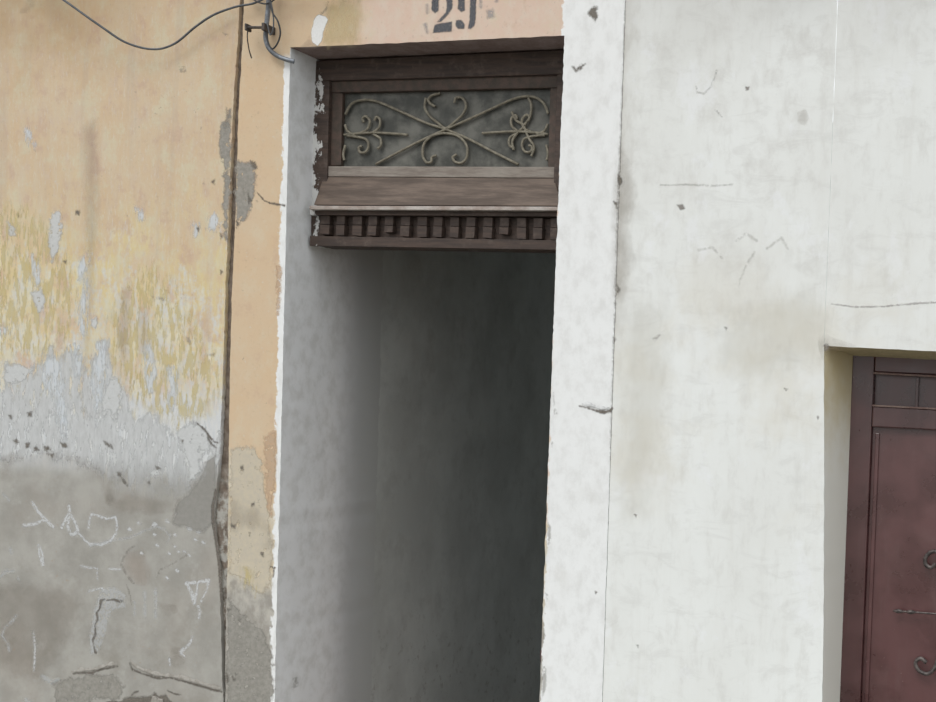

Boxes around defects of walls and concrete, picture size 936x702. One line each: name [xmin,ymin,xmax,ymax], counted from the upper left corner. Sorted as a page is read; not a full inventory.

flaking render [194,109,257,240]
peeling [0,211,218,484]
crack [211,0,244,660]
crack [841,300,936,308]
peeling [227,432,276,593]
crack [71,599,222,692]